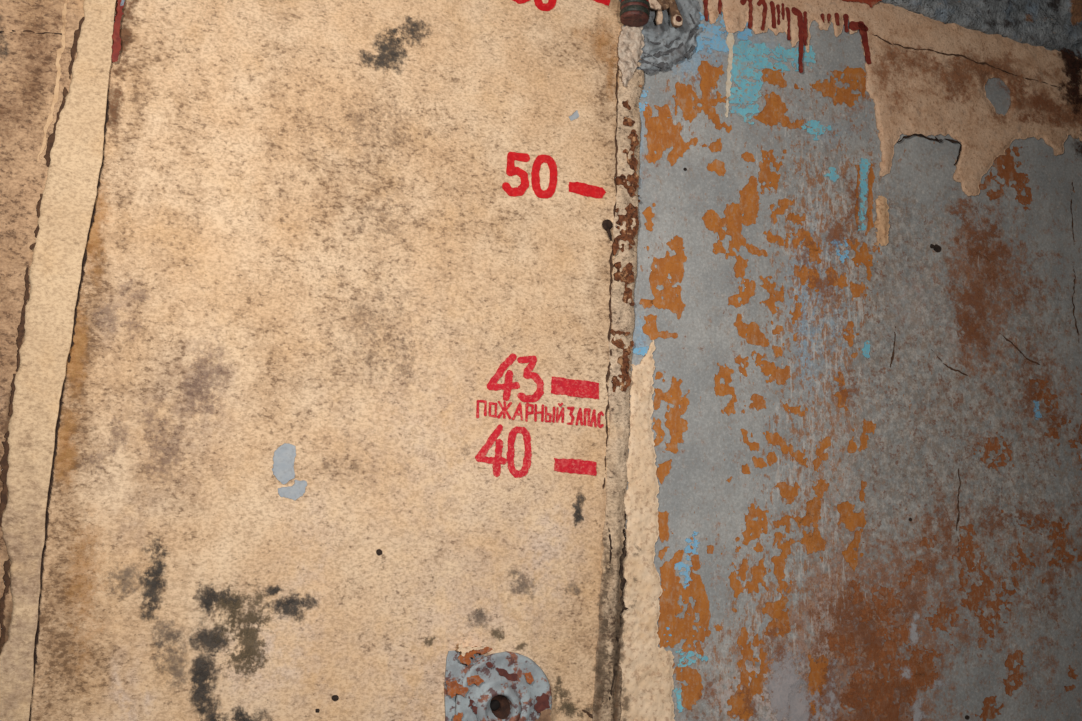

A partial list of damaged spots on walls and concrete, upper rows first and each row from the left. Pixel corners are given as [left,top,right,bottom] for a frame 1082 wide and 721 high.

crack [0,0,85,167]
leakage [360,17,429,70]
corrosion [828,176,865,250]
corrosion [949,198,1011,349]
crack [0,194,42,527]
crack [29,90,109,721]
peeling [610,0,1082,721]
crack [0,555,11,654]
leakage [117,539,317,721]
spalling [455,643,484,656]
corrosion [809,584,910,721]